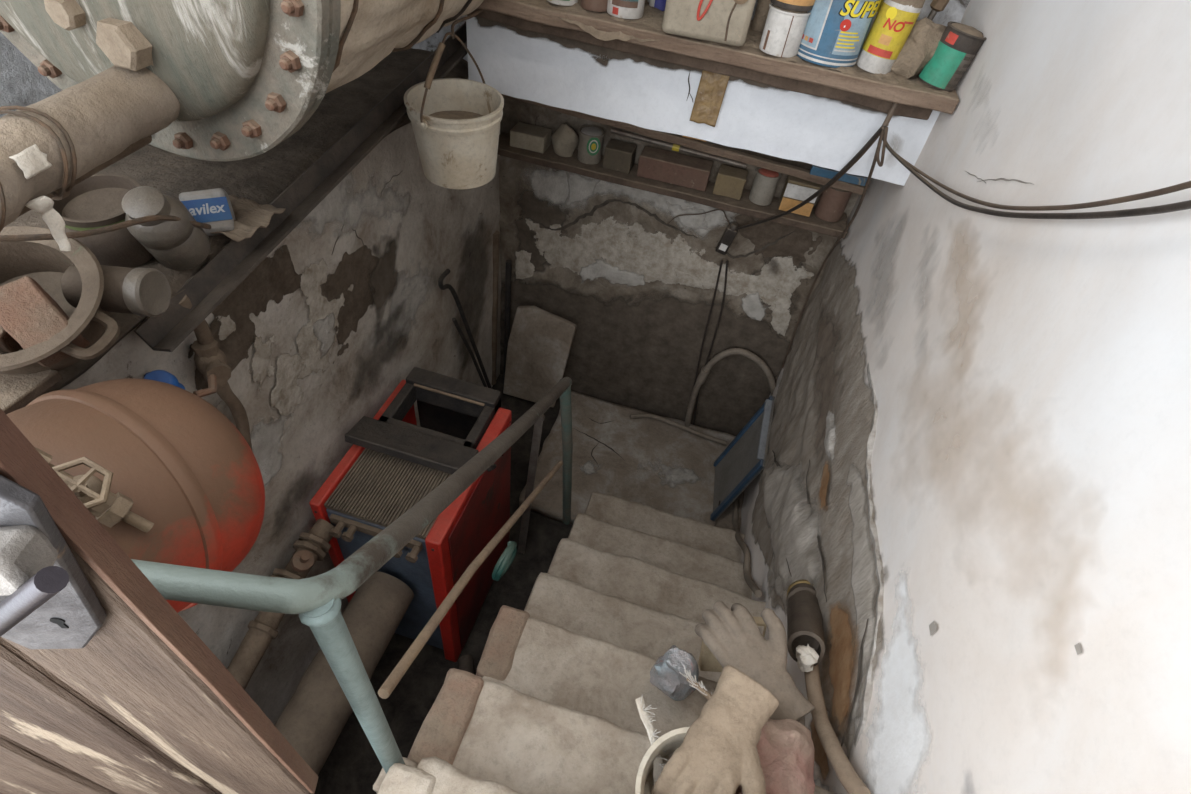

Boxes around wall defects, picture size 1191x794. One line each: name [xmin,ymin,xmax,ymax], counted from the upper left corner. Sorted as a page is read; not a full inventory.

flaking render [188,344,208,391]
flaking render [210,245,354,416]
spalling [515,169,886,760]
leakage [866,575,930,794]